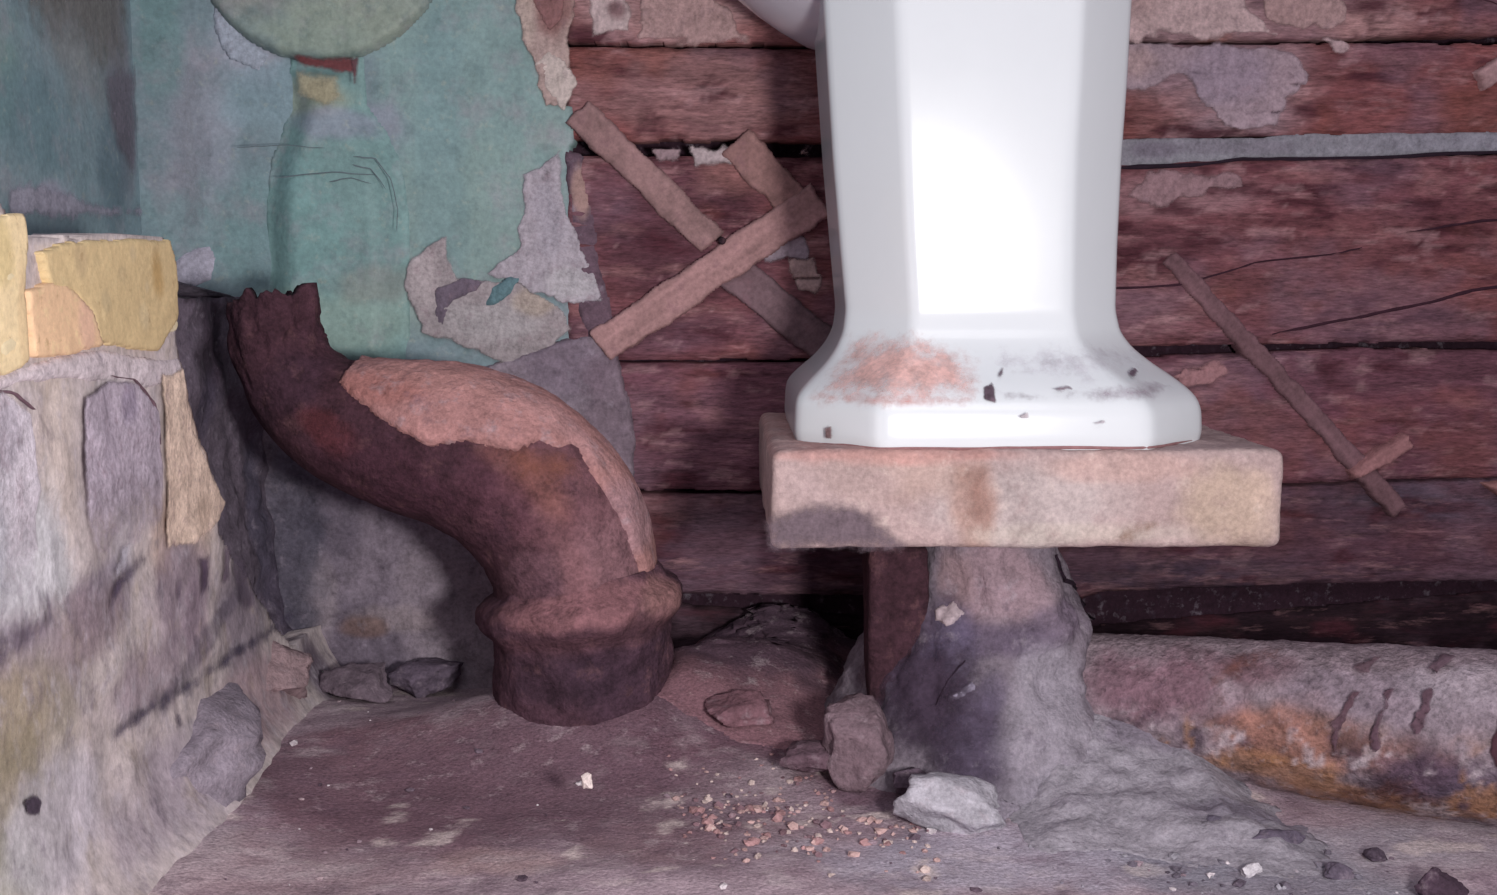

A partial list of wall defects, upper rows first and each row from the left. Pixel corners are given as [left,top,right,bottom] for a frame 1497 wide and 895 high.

spalling [515,0,748,110]
peeling [1127,0,1349,129]
spalling [404,150,636,477]
crack [1116,247,1362,289]
crack [1272,285,1497,335]
crack [1409,219,1497,232]
corrosion [835,344,966,396]
spalling [262,430,494,689]